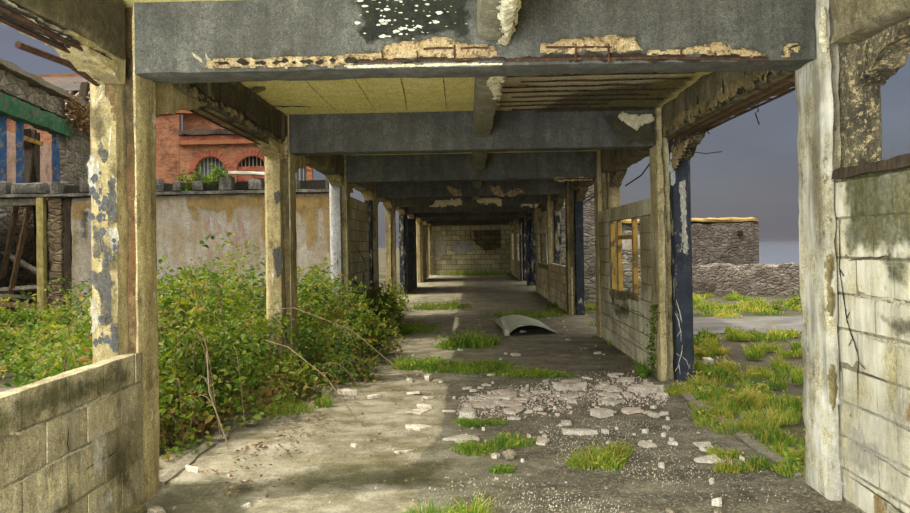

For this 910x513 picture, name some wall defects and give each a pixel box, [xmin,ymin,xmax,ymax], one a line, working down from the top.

spalling [781,42,800,57]
peeling [192,0,795,253]
peeling [87,142,119,353]
water stain [892,321,910,334]
water stain [0,366,127,429]
water stain [94,432,131,513]